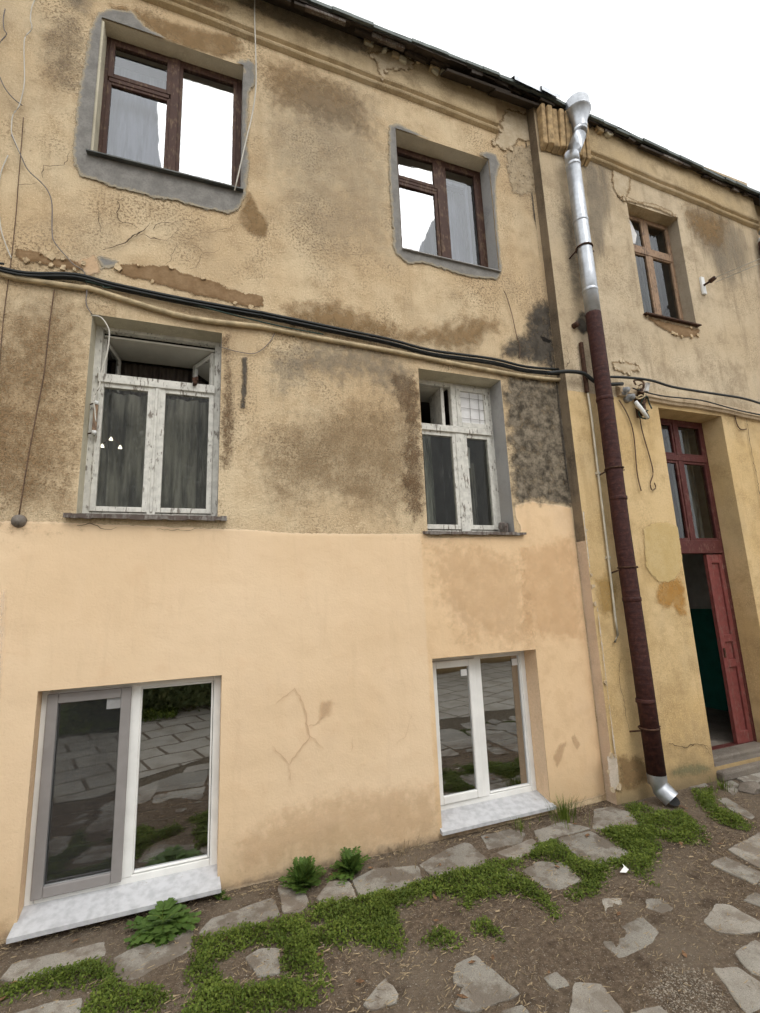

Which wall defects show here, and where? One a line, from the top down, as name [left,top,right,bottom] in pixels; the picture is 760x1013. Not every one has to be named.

peeling [15,249,264,310]
crack [98,197,235,269]
leakage [502,301,572,507]
crack [275,688,323,785]